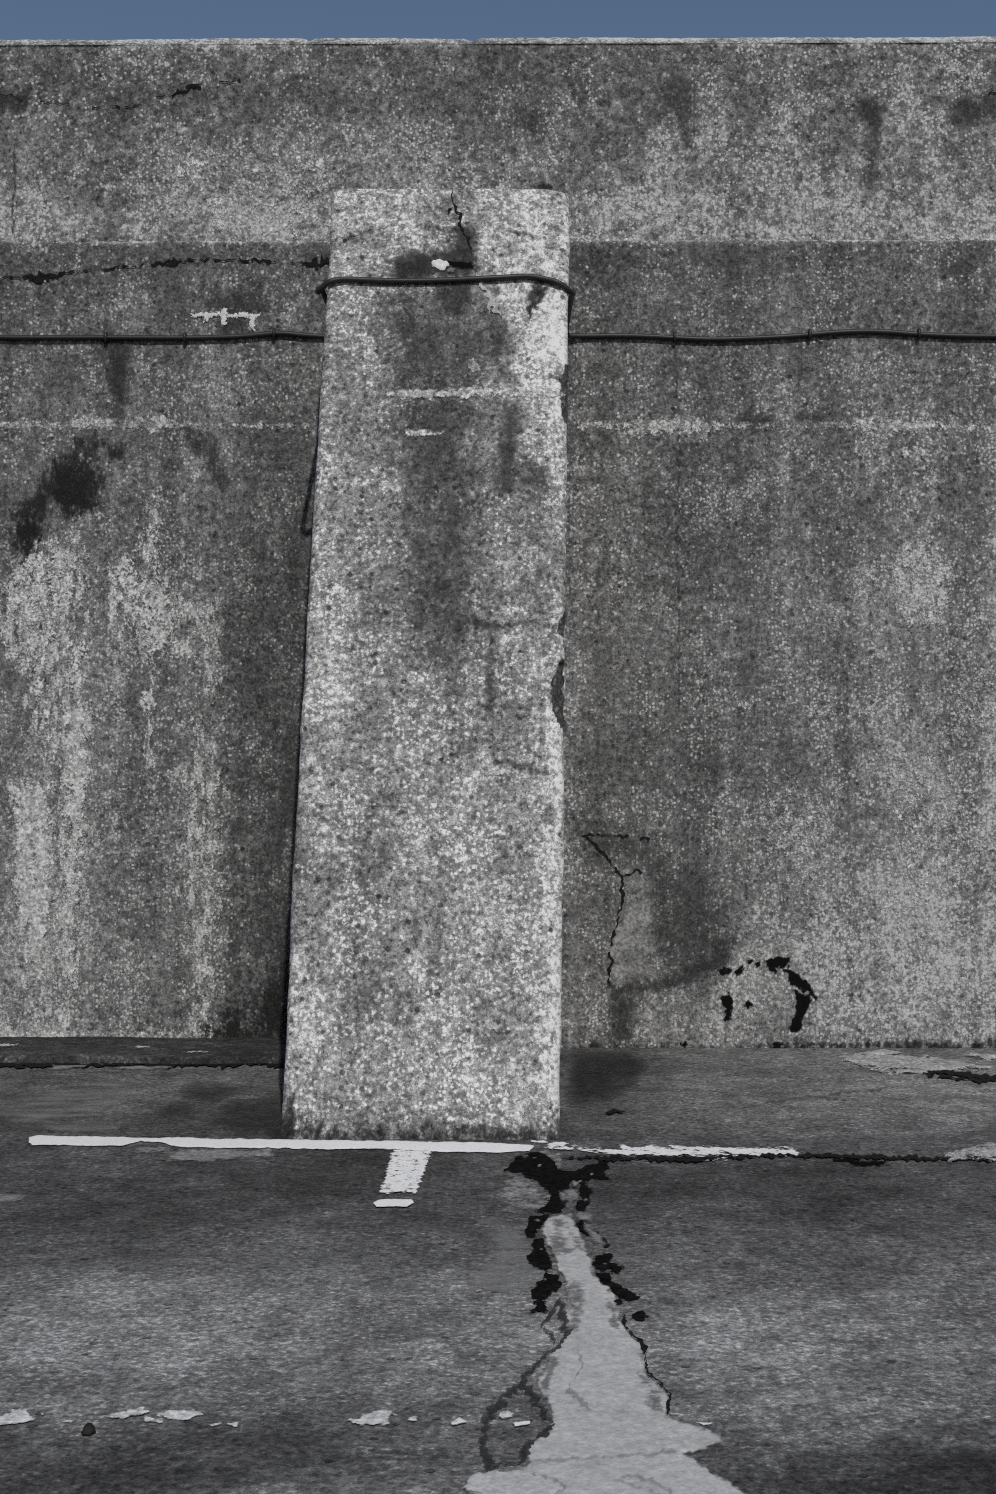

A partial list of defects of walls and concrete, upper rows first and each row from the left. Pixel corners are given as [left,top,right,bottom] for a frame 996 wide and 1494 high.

crack [0,255,329,283]
leakage [0,340,316,1038]
crack [582,833,657,985]
crack [910,1070,996,1083]
crack [561,1142,996,1163]
crack [478,1297,573,1471]
crack [621,1313,672,1414]